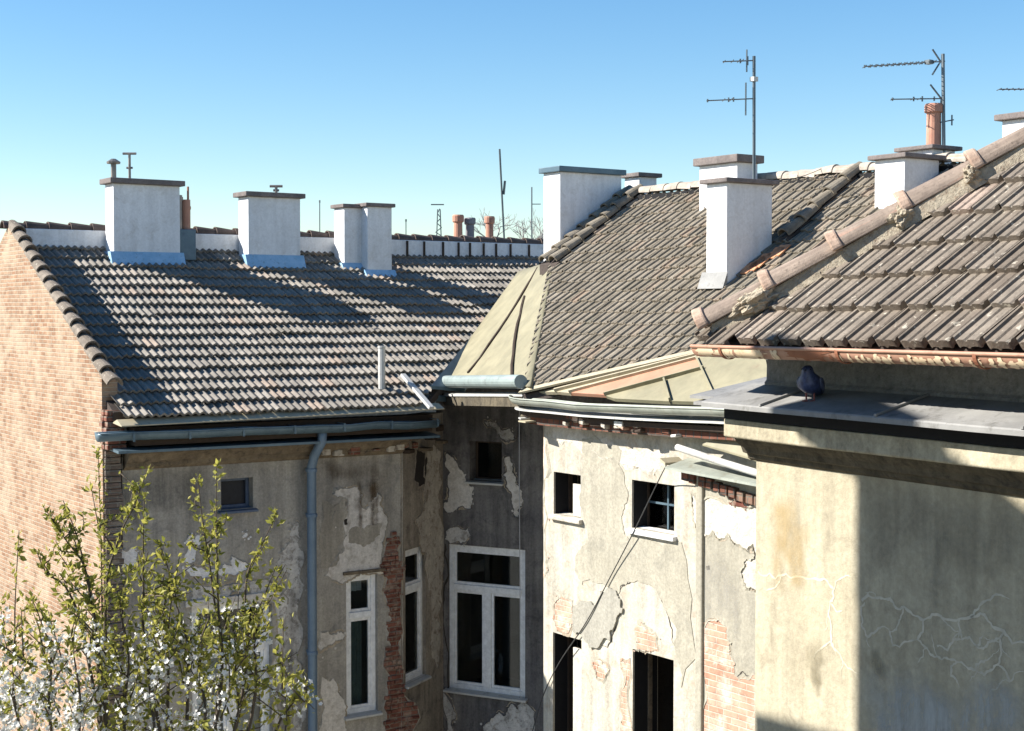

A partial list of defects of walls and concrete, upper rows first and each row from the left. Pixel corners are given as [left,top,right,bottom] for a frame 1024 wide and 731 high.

flaking render [483,416,524,520]
flaking render [182,520,348,731]
flaking render [318,485,421,731]
flaking render [413,443,476,731]
flaking render [480,697,536,731]
flaking render [552,592,573,637]
flaking render [690,489,756,593]
flaking render [694,618,755,731]
crack [758,570,1024,690]